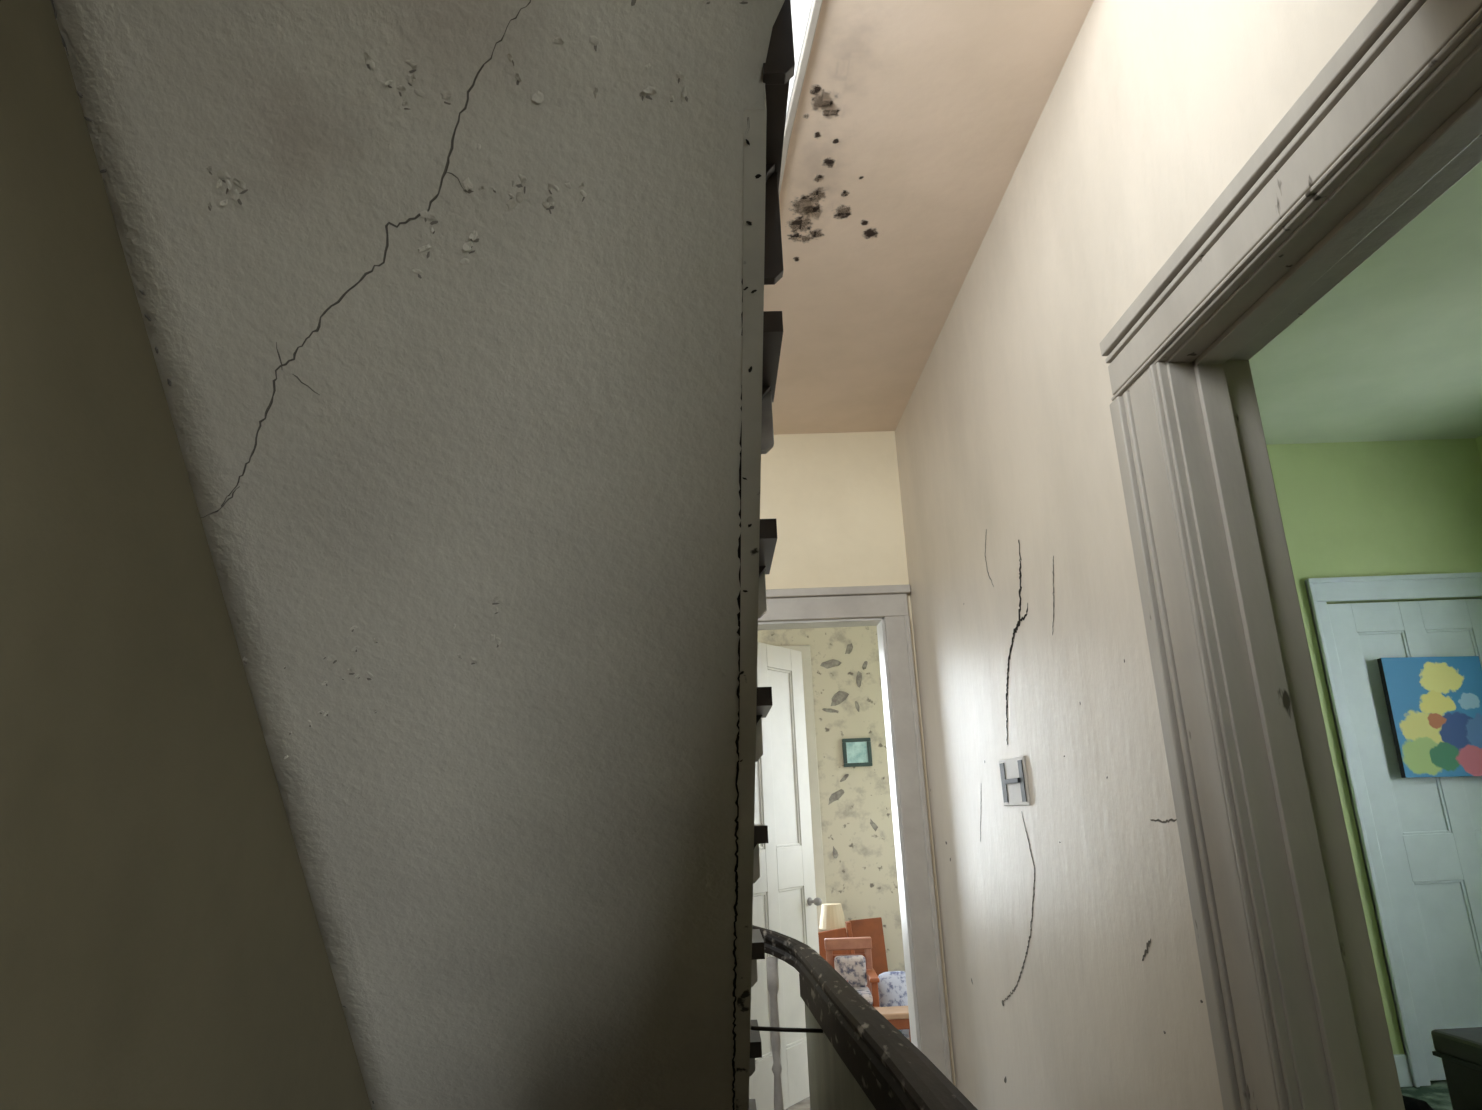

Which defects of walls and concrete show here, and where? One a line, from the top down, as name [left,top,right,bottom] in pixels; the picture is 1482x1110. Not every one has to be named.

crack [201,0,531,518]
damp [789,85,878,261]
crack [985,529,1054,745]
crack [1004,815,1035,1001]